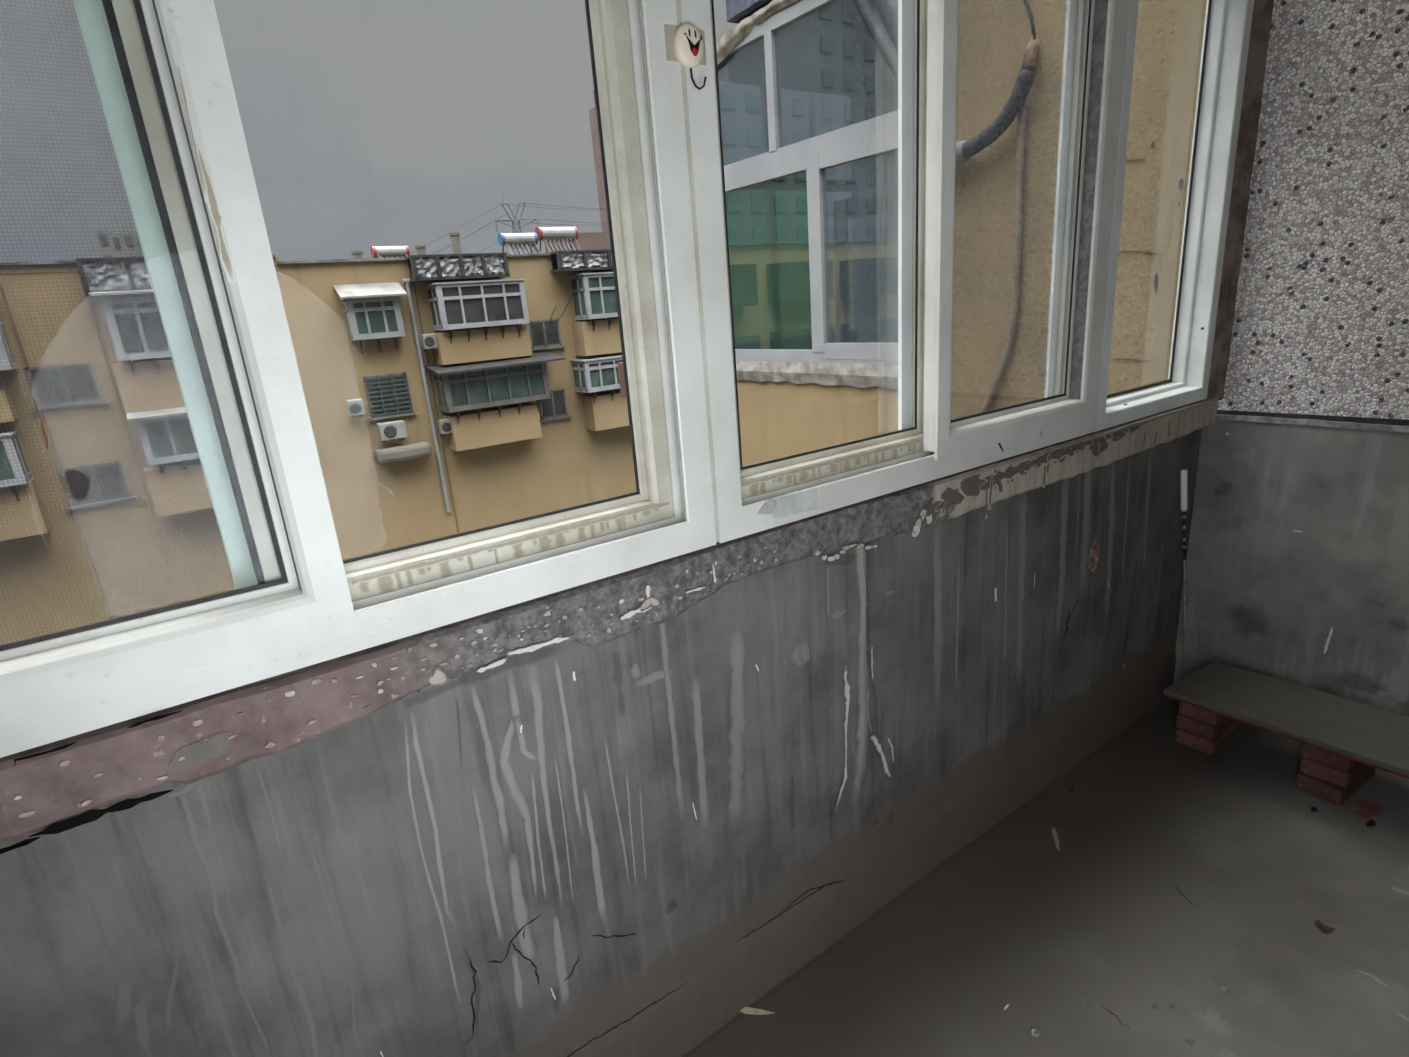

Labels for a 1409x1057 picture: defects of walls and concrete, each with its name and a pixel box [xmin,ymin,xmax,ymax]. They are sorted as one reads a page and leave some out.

peeling [907,418,1170,537]
spalling [815,543,877,568]
peeling [351,535,783,712]
damp [658,622,748,844]
peeling [14,795,36,818]
crack [0,789,173,854]
damp [403,712,483,1041]
damp [455,656,610,1019]
damp [603,736,648,896]
crack [738,879,847,941]
crack [465,914,635,1044]
crack [568,987,680,1057]